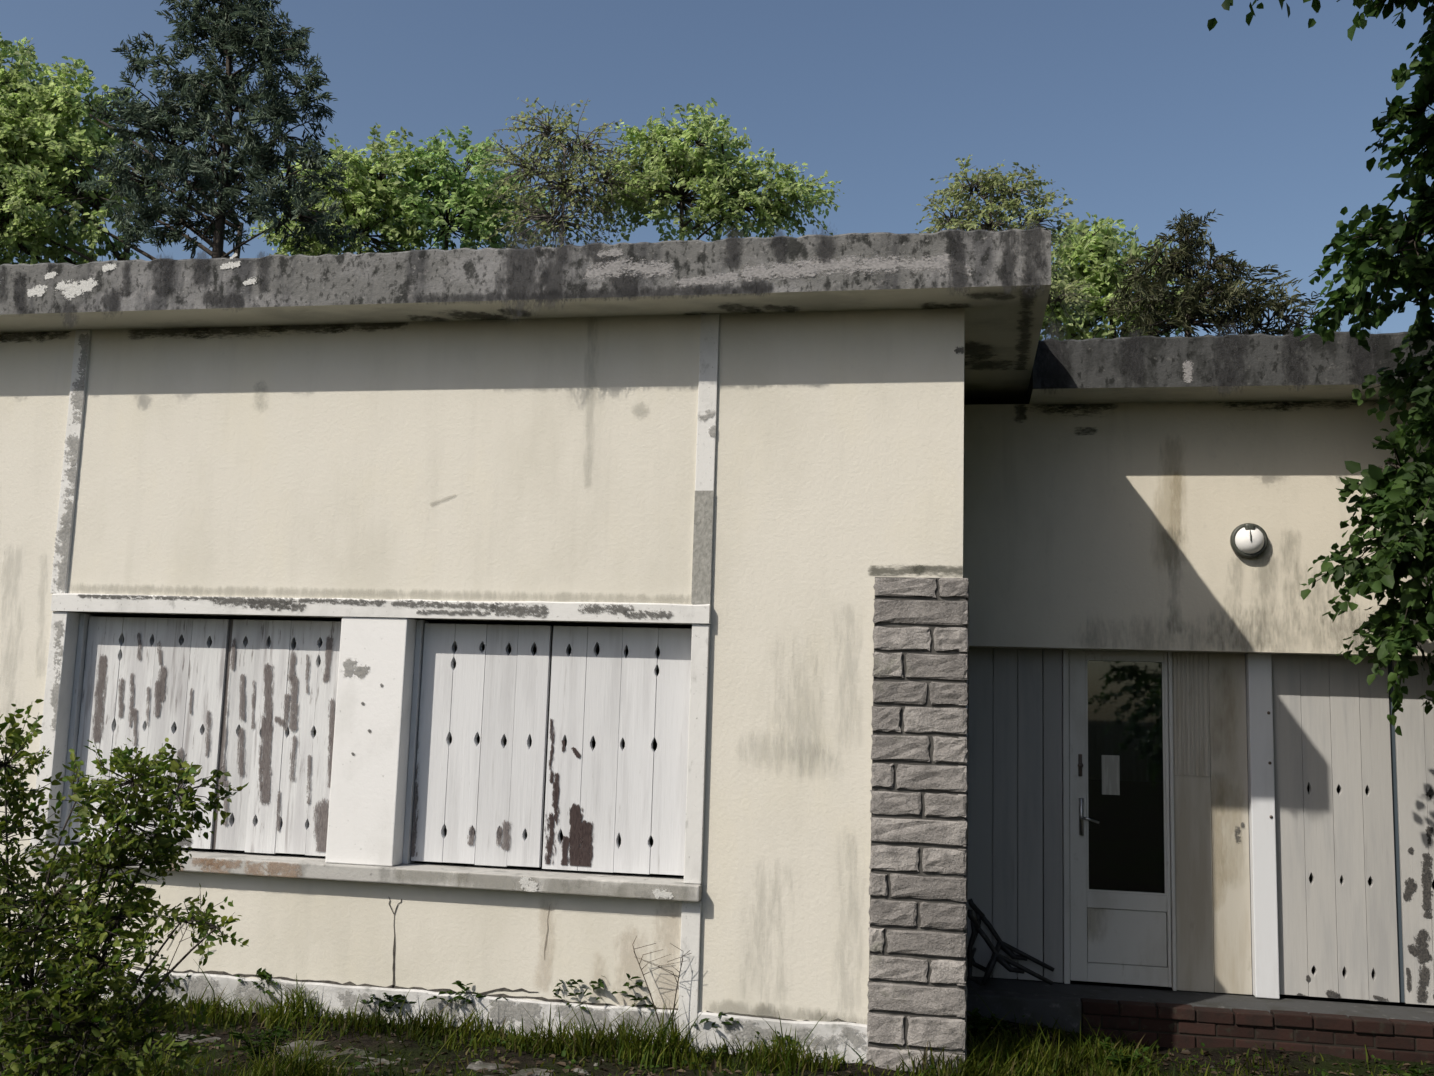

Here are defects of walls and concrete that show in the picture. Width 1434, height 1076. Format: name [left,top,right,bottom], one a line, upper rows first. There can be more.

leakage [0,267,26,314]
leakage [0,301,76,342]
leakage [102,263,129,314]
leakage [130,220,1115,421]
leakage [1183,361,1193,383]
leakage [1213,324,1379,410]
peeling [53,333,89,593]
peeling [92,633,167,746]
peeling [189,636,369,852]
peeling [1403,826,1434,1002]